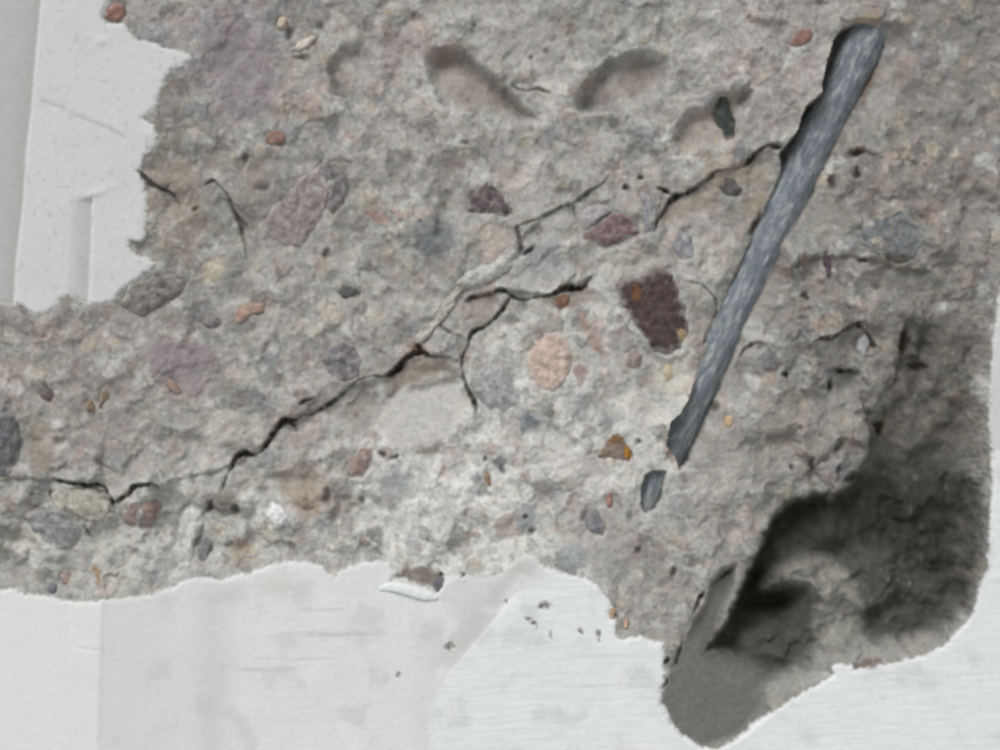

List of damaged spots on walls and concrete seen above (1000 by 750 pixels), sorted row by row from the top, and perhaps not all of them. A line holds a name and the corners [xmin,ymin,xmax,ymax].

spalling [263,168,335,248]
spalling [455,255,514,289]
crack [550,285,585,295]
crack [385,345,429,377]
crack [461,289,514,408]
spalling [526,332,572,391]
crack [232,394,343,465]
spalling [380,377,469,452]
spalling [51,487,111,521]
crack [59,480,151,505]
spalling [705,427,982,676]
water stain [762,475,977,597]